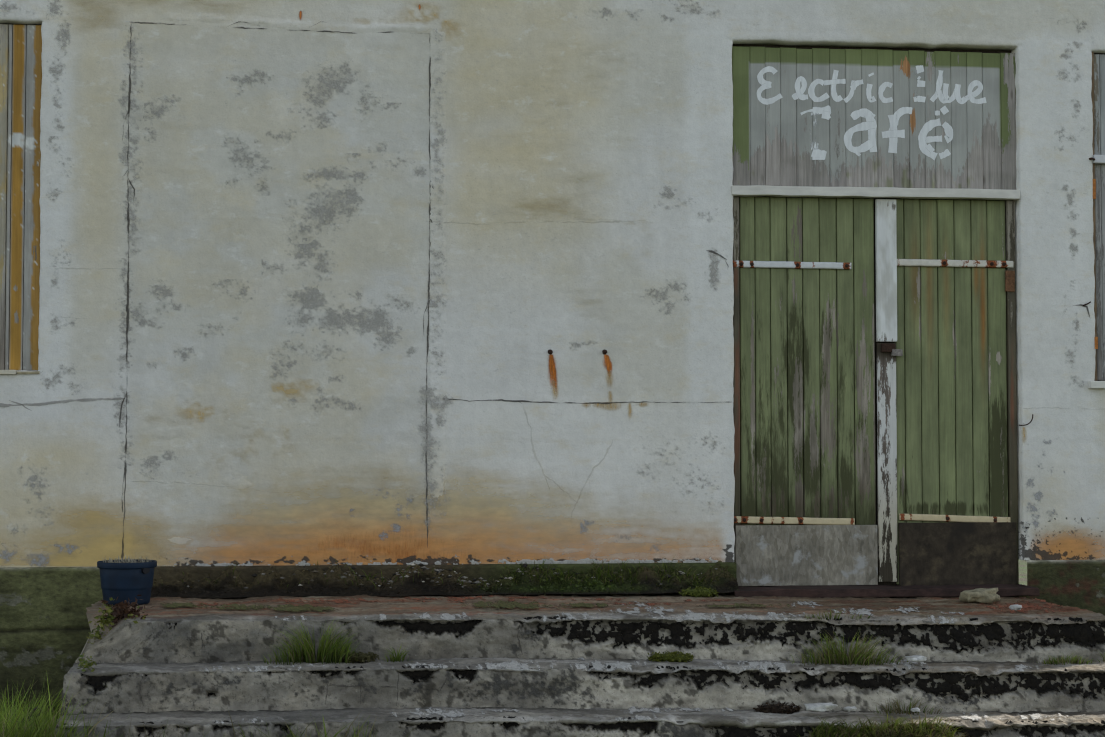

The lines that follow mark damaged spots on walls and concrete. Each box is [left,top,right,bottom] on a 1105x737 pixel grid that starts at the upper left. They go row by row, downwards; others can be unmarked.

peeling [293,288,394,344]
crack [423,39,680,547]
rust [549,354,557,394]
rust [597,354,612,408]
water stain [21,489,718,567]
flaking render [1018,479,1103,560]
spalling [365,595,492,638]
peeling [200,664,364,677]
peeling [401,660,553,682]
spalling [524,598,1105,737]
spalling [137,721,164,737]
peeling [392,707,524,732]